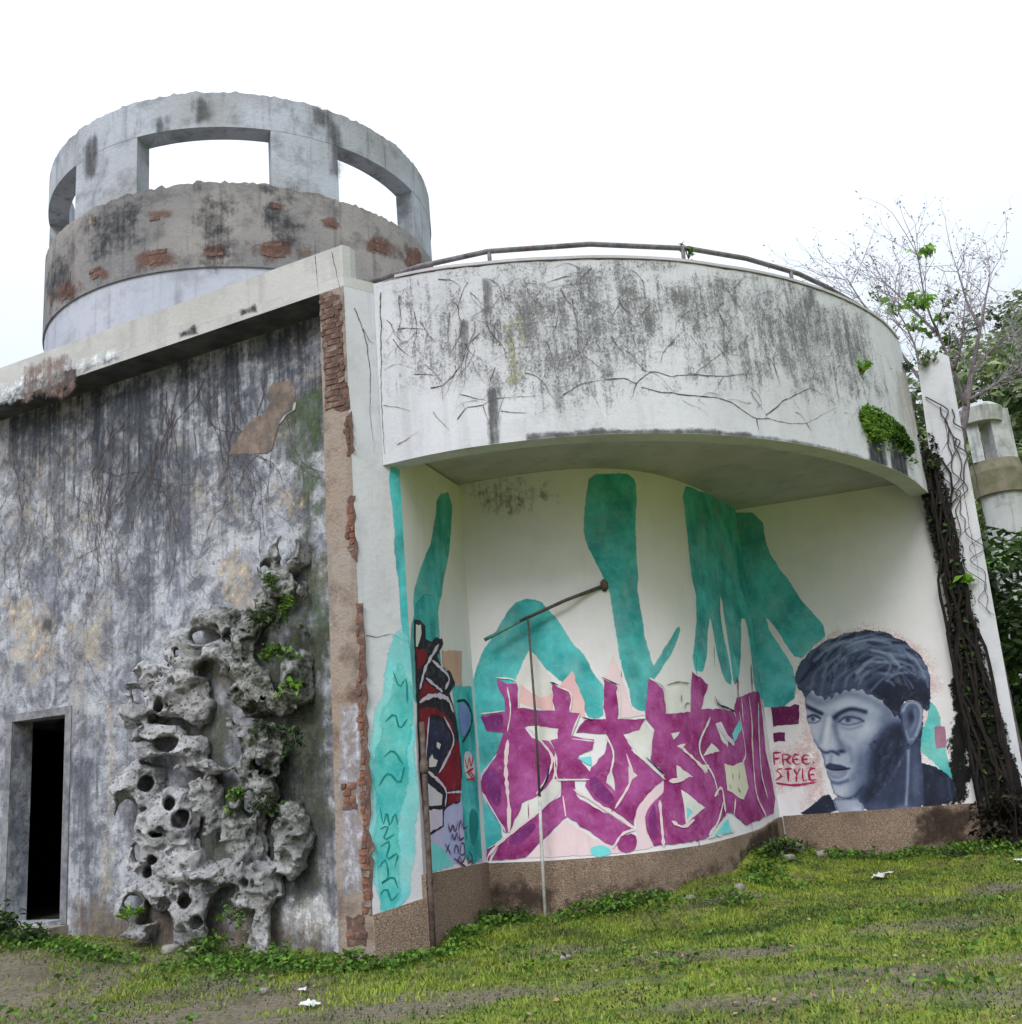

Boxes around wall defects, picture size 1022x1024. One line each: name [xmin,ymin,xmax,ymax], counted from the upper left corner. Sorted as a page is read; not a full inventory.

damp [83,135,96,178]
damp [314,107,343,176]
spalling [367,236,424,267]
damp [5,323,321,662]
flaking render [228,379,297,455]
spalling [319,291,355,457]
spalling [344,495,358,562]
crack [315,252,835,454]
damp [379,259,1022,848]
damp [69,749,174,946]
damp [269,843,333,952]
spalling [340,603,376,947]